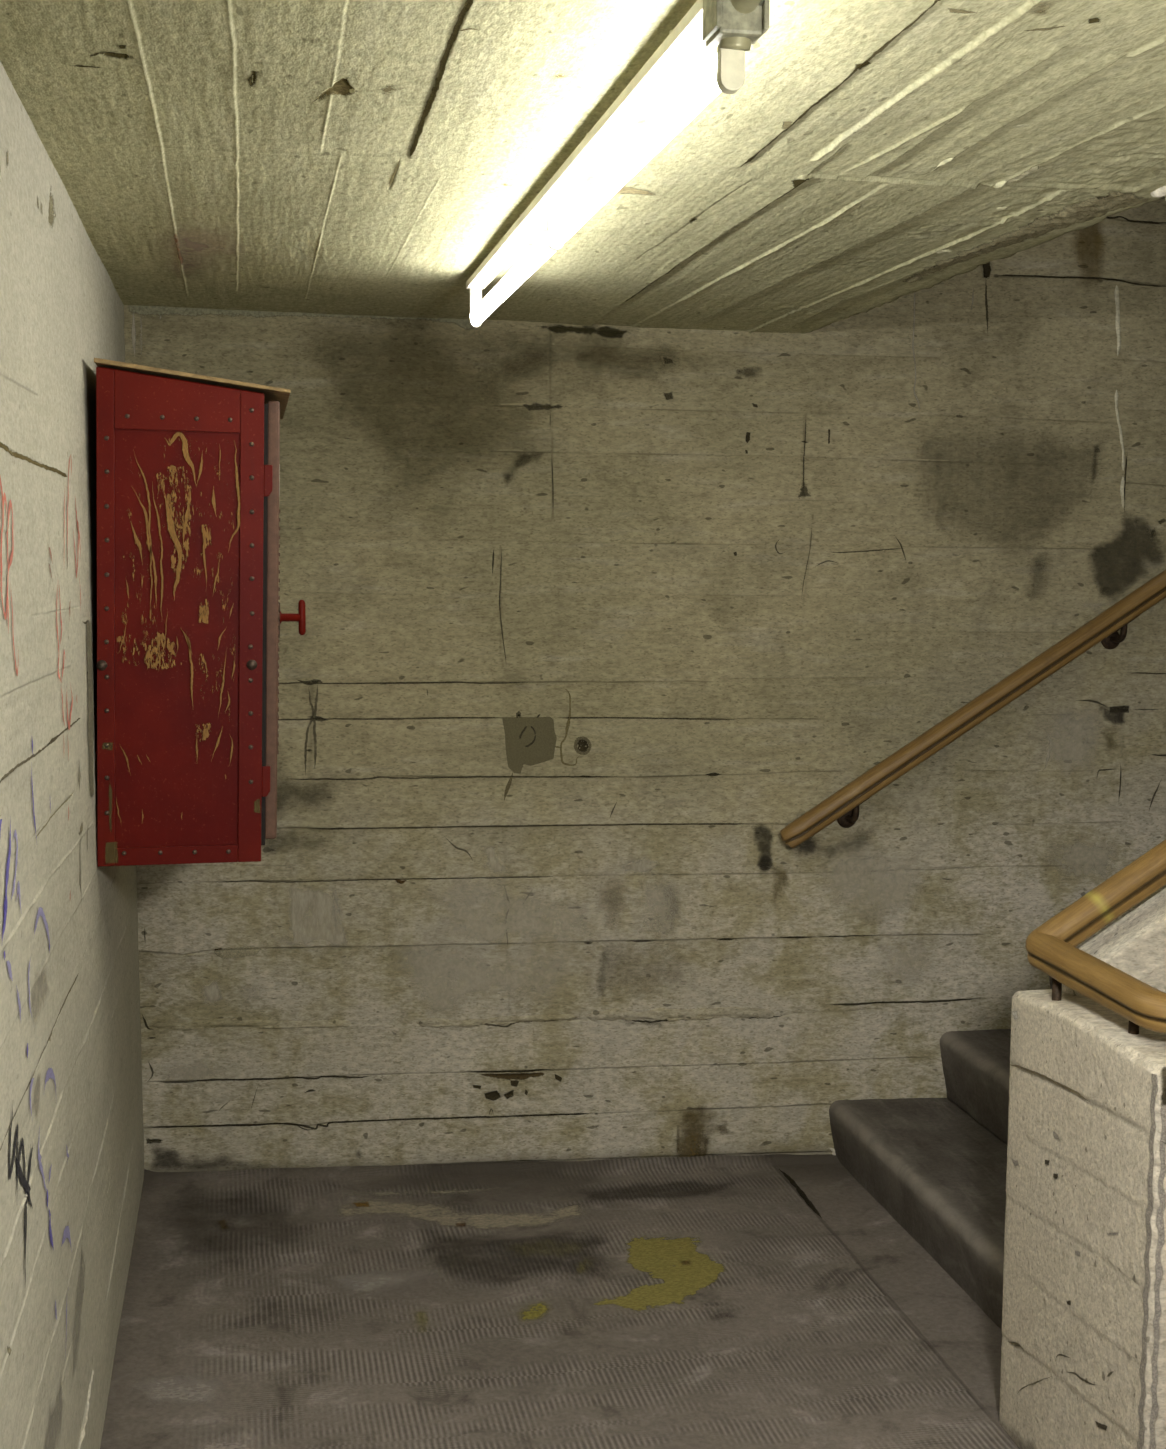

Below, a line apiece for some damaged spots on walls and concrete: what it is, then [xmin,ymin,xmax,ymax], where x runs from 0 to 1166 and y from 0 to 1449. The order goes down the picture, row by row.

spalling [313,78,358,102]
leakage [543,325,627,338]
spalling [983,262,991,334]
leakage [1091,390,1166,596]
crack [0,718,80,816]
crack [36,793,73,837]
leakage [755,826,786,894]